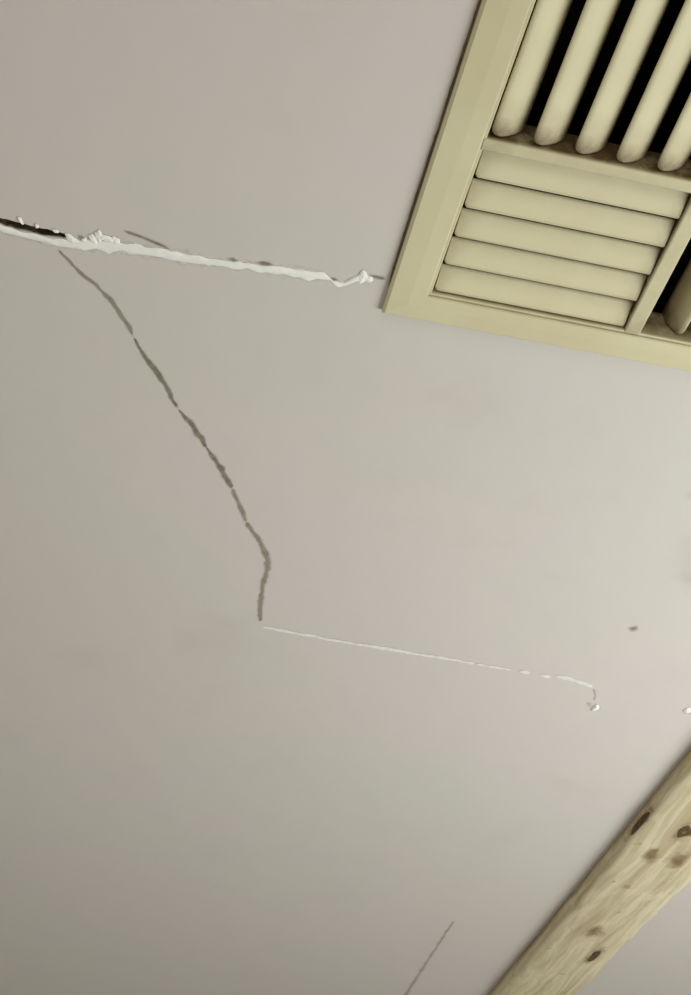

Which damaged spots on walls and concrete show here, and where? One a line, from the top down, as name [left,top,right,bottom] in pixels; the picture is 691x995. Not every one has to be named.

crack [0,217,593,688]